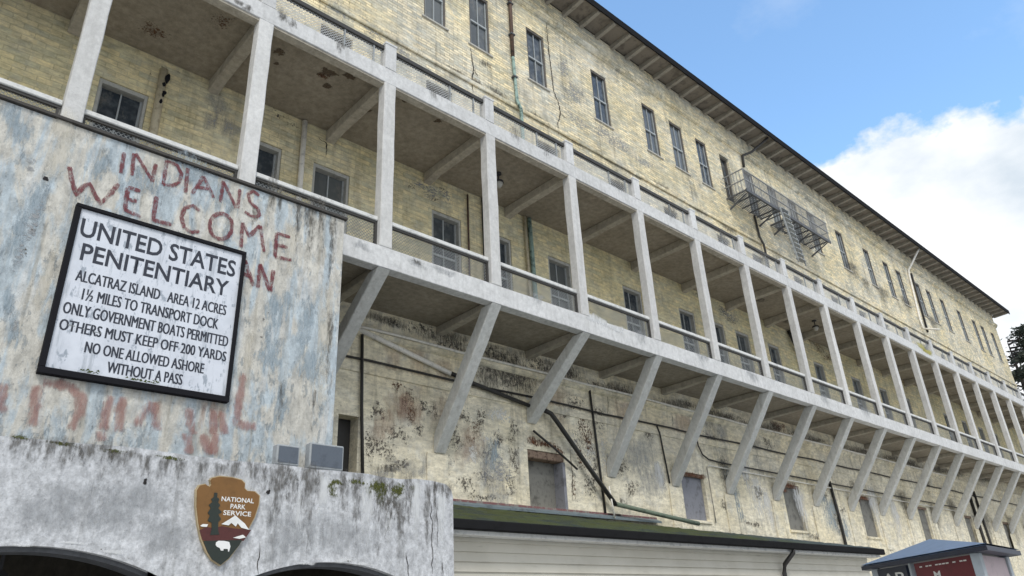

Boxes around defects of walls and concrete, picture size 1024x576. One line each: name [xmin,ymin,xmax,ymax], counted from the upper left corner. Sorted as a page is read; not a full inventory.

crack [546,23,566,134]
damp [10,438,182,470]